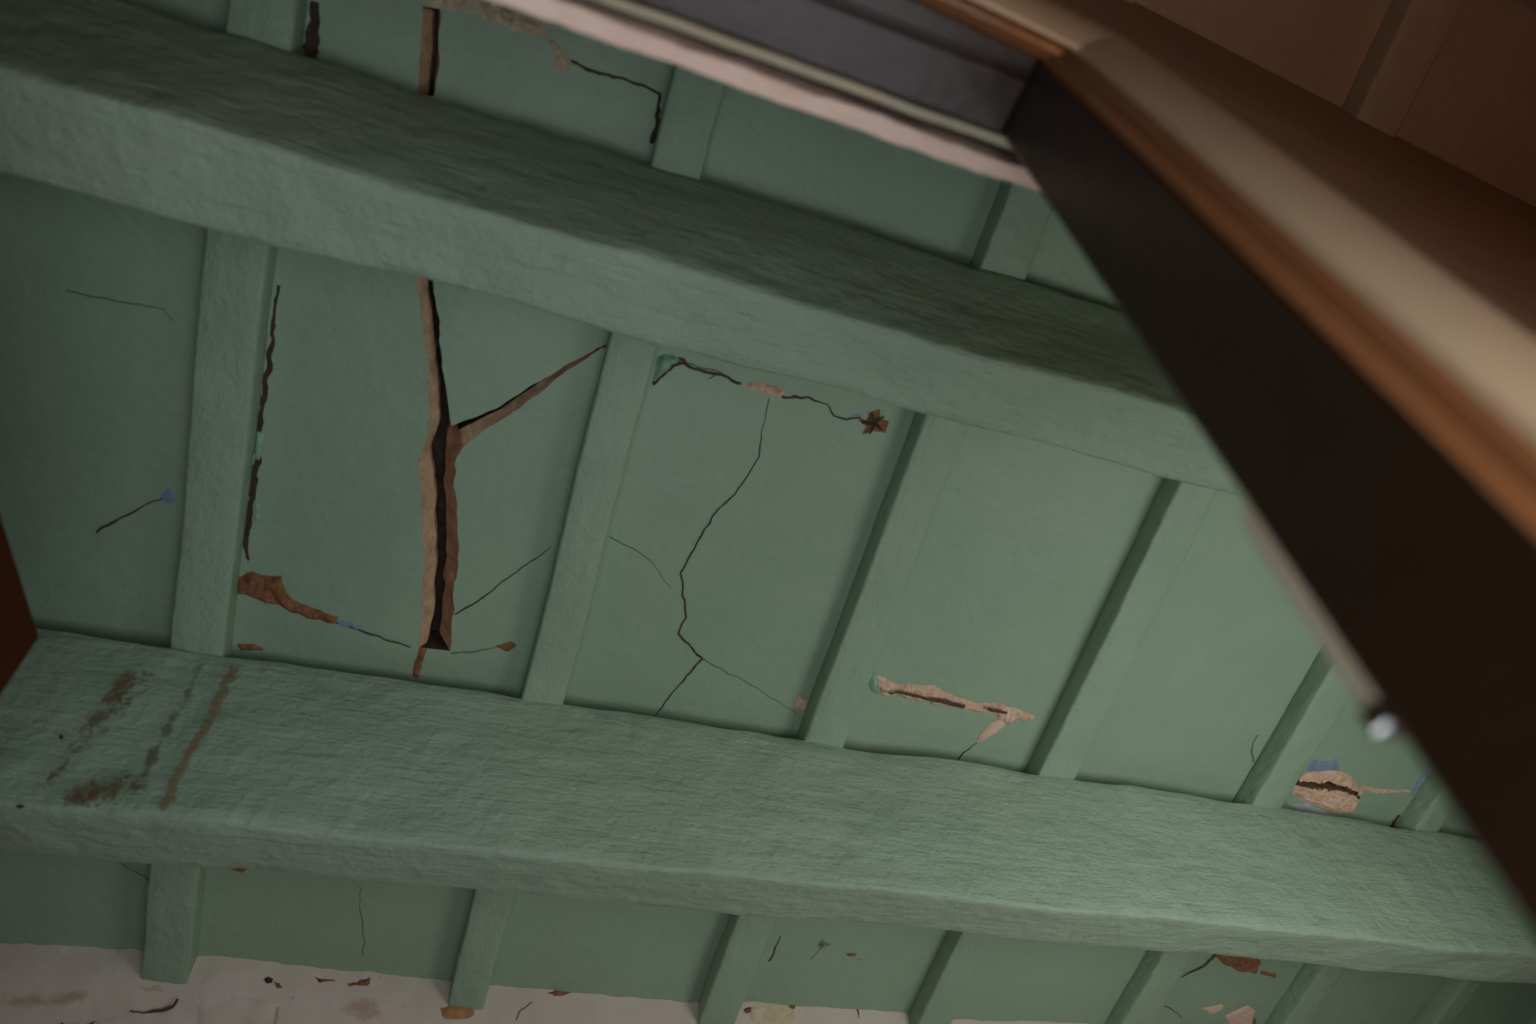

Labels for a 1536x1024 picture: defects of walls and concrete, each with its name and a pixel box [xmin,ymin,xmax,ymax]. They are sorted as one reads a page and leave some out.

crack [417,8,441,96]
spalling [419,0,661,144]
crack [243,285,280,561]
crack [413,276,607,678]
crack [610,354,889,716]
spalling [237,572,410,648]
leakage [140,667,201,778]
spalling [868,672,1035,761]
spalling [1288,759,1411,816]
spalling [1181,954,1276,978]
peeling [1202,1004,1255,1024]